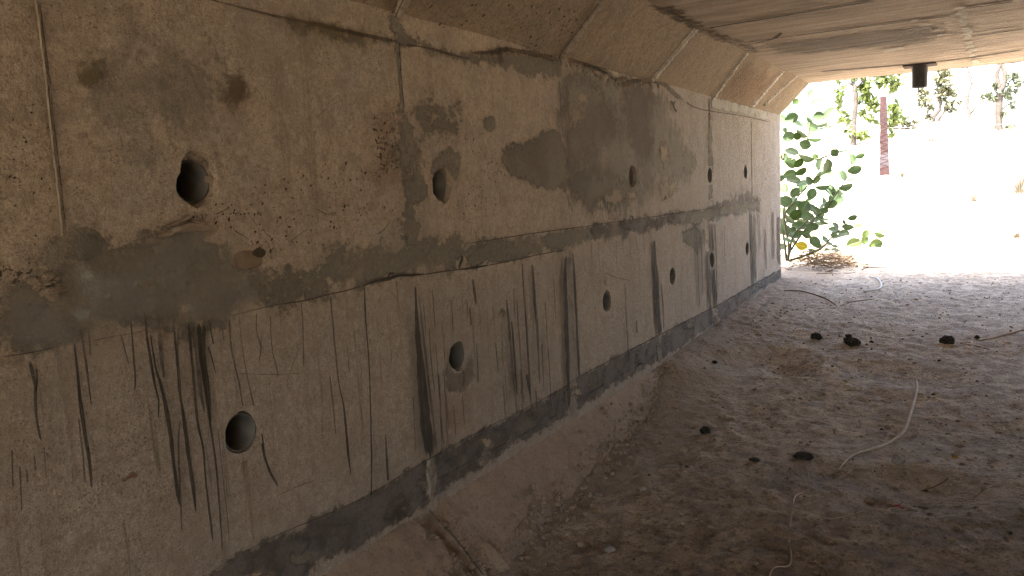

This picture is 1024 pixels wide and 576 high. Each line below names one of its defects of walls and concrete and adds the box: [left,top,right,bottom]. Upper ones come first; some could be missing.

damp [412,87,462,147]
crack [233,207,716,316]
damp [11,362,46,509]
damp [74,265,139,487]
damp [121,211,781,576]